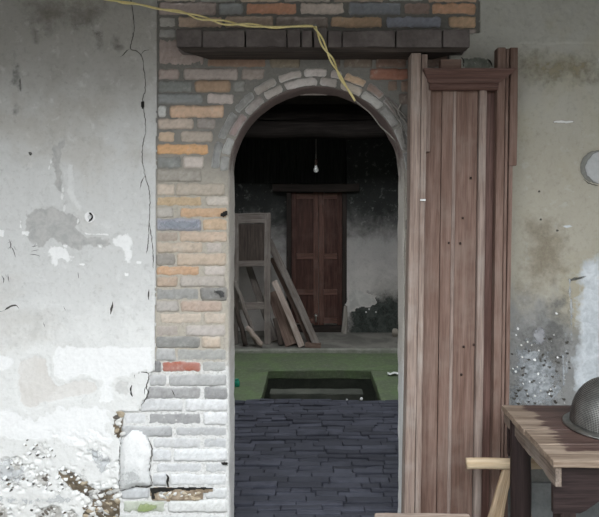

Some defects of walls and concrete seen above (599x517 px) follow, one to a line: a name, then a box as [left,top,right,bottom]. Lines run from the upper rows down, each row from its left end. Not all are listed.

crack [120,0,154,262]
water stain [527,322,567,385]
flaking render [14,355,99,413]
crack [130,371,155,405]
flaking render [113,411,126,438]
flaking render [3,457,23,492]
flaking render [22,466,122,517]
spalling [150,487,213,502]